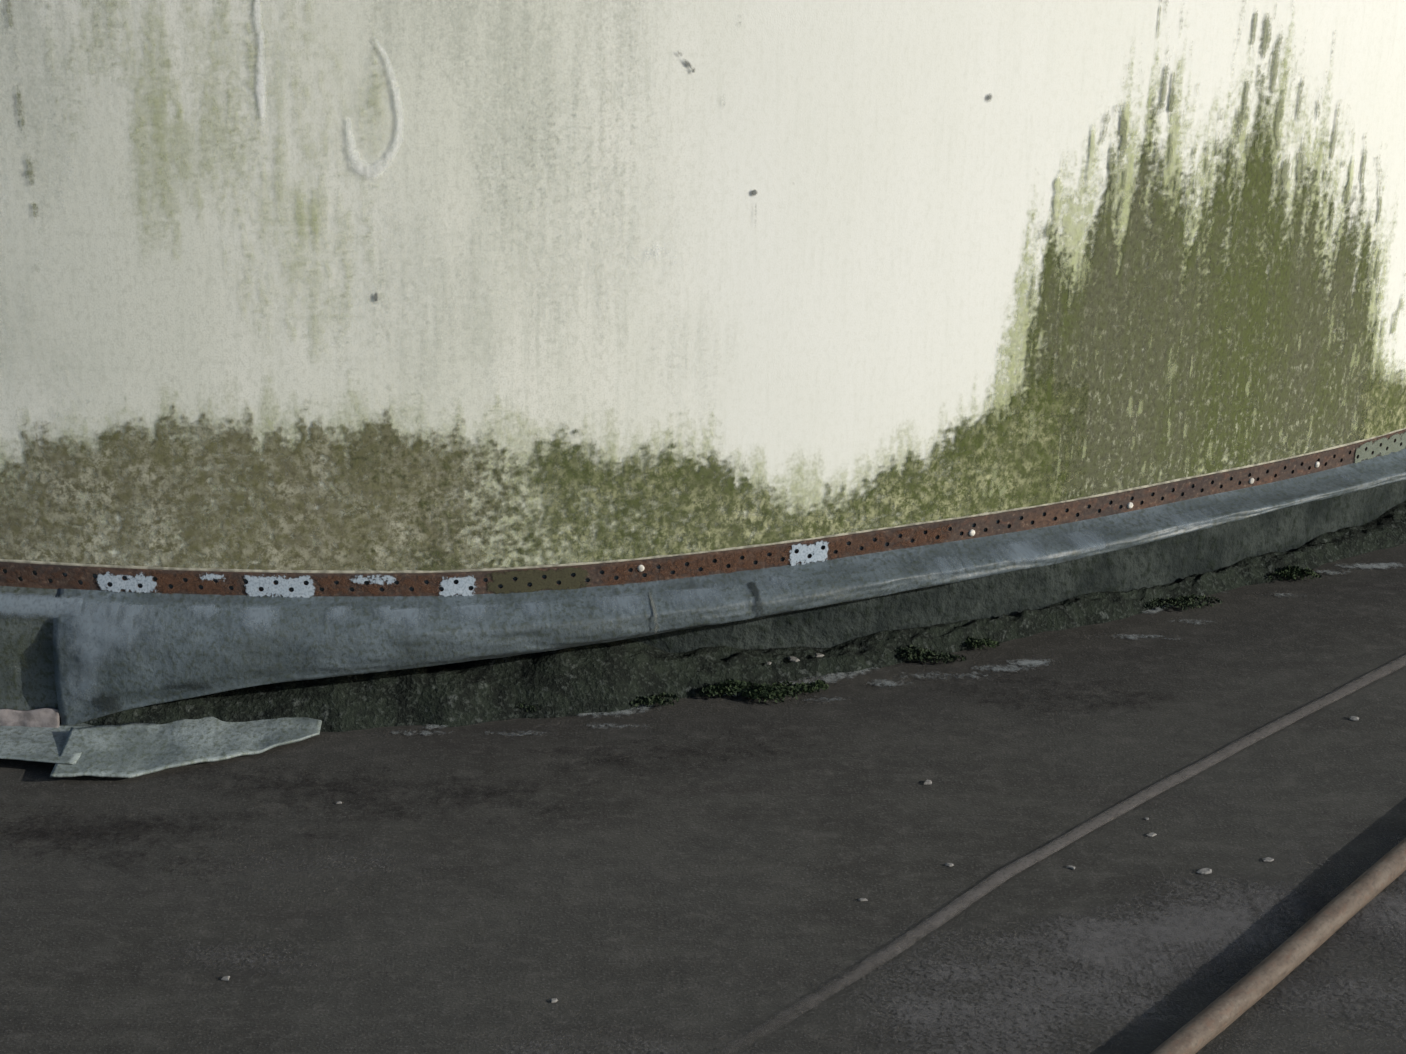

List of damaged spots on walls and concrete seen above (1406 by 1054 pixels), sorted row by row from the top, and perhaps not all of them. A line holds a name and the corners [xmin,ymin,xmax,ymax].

leakage [1087,6,1320,256]
leakage [1324,104,1382,239]
leakage [1126,397,1142,449]
leakage [1166,331,1193,439]
leakage [1342,250,1404,431]
rust [146,571,241,596]
rust [314,576,460,596]
rust [602,546,797,585]